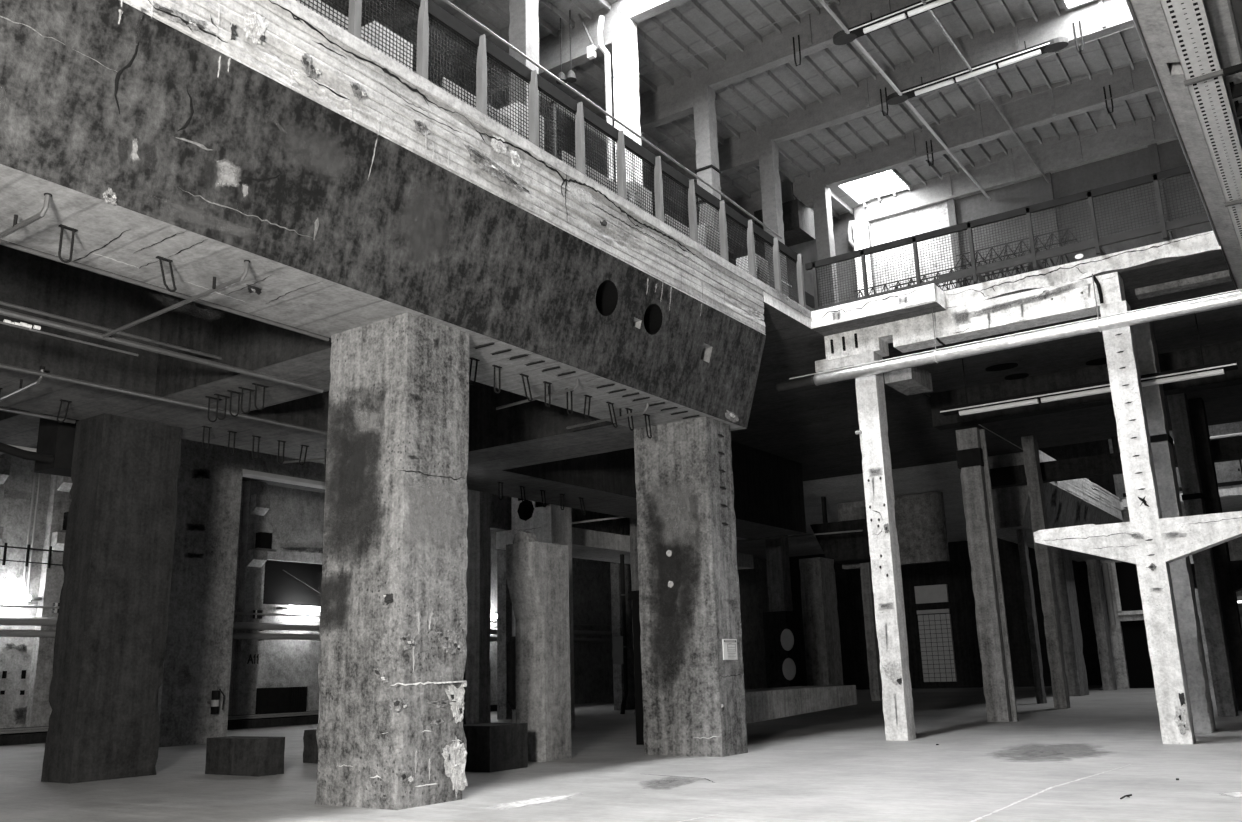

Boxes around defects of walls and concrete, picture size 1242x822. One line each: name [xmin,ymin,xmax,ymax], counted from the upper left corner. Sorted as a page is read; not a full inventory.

spalling [300,53,321,80]
spalling [349,81,368,101]
spalling [425,683,465,725]
spalling [396,765,416,789]
spalling [442,740,468,797]